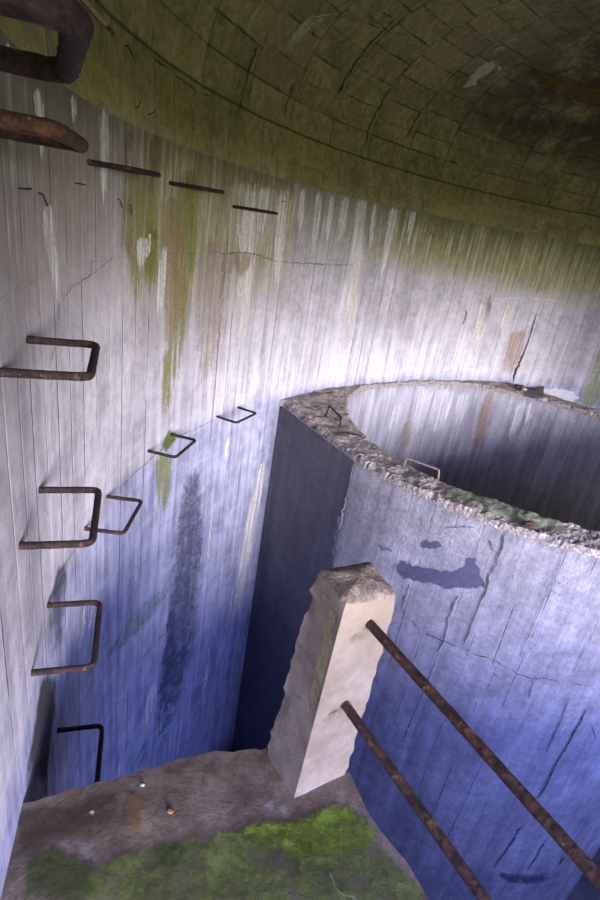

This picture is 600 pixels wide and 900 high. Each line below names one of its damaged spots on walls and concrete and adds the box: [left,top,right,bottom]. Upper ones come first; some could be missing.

crack [338,19,395,94]
peeling [463,40,506,87]
water stain [124,171,197,411]
crack [202,249,349,266]
water stain [227,185,376,341]
water stain [379,208,398,285]
crack [513,314,537,381]
water stain [143,474,215,731]
water stain [421,541,442,549]
water stain [397,558,483,589]
crack [401,527,599,799]
crack [493,824,524,868]